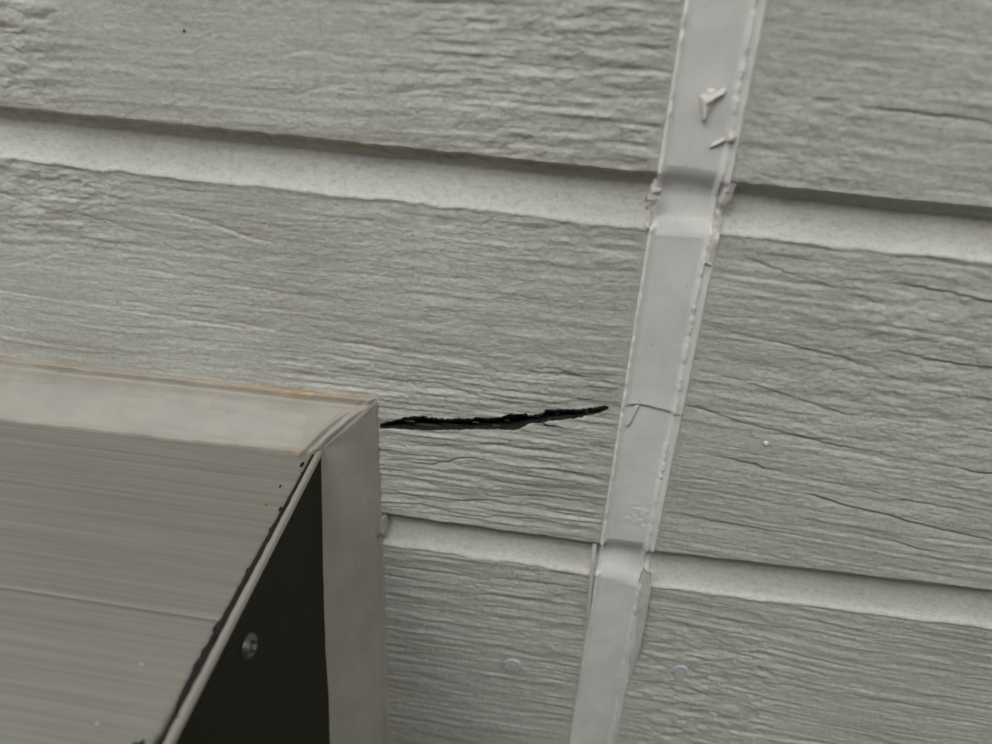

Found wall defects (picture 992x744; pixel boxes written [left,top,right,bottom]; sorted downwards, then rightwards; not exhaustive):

crack [380,404,683,433]